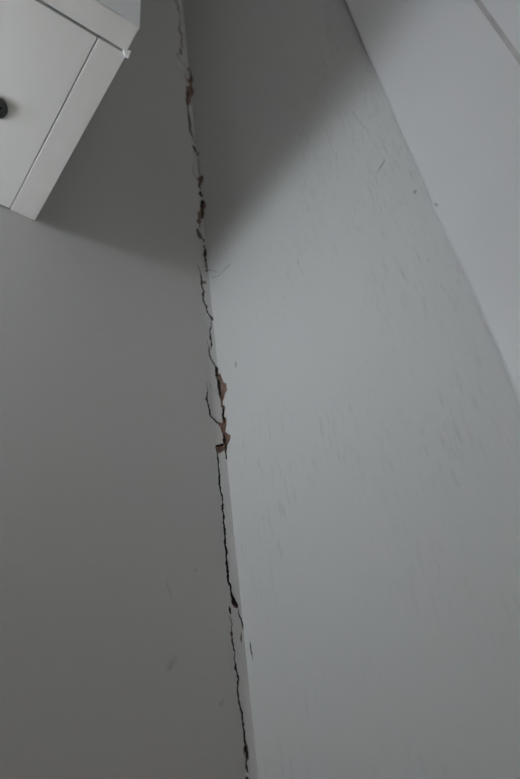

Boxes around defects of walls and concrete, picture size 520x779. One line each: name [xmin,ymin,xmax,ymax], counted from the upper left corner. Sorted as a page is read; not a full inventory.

crack [187,109,199,156]
crack [197,265,226,365]
flaking render [205,366,231,459]
crack [217,454,253,779]